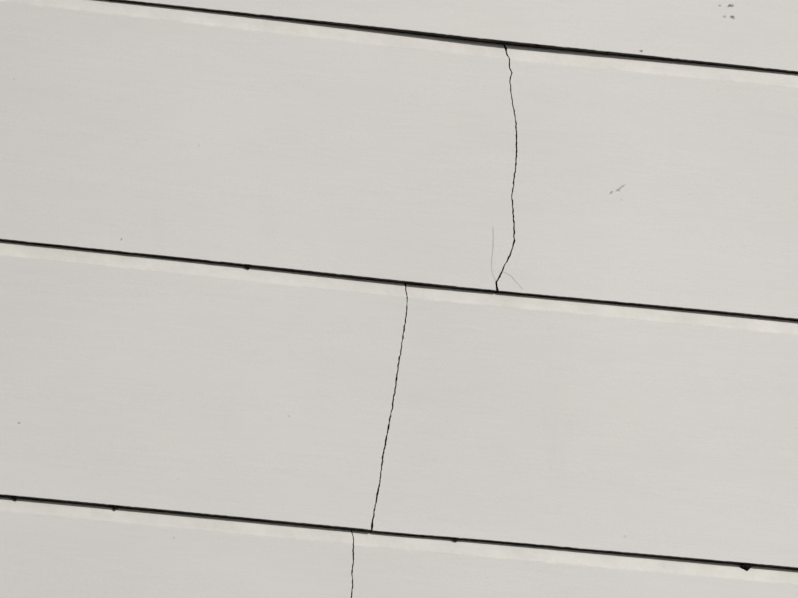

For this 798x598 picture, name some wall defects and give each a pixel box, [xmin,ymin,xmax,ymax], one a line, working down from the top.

crack [491,45,523,291]
crack [351,284,407,597]